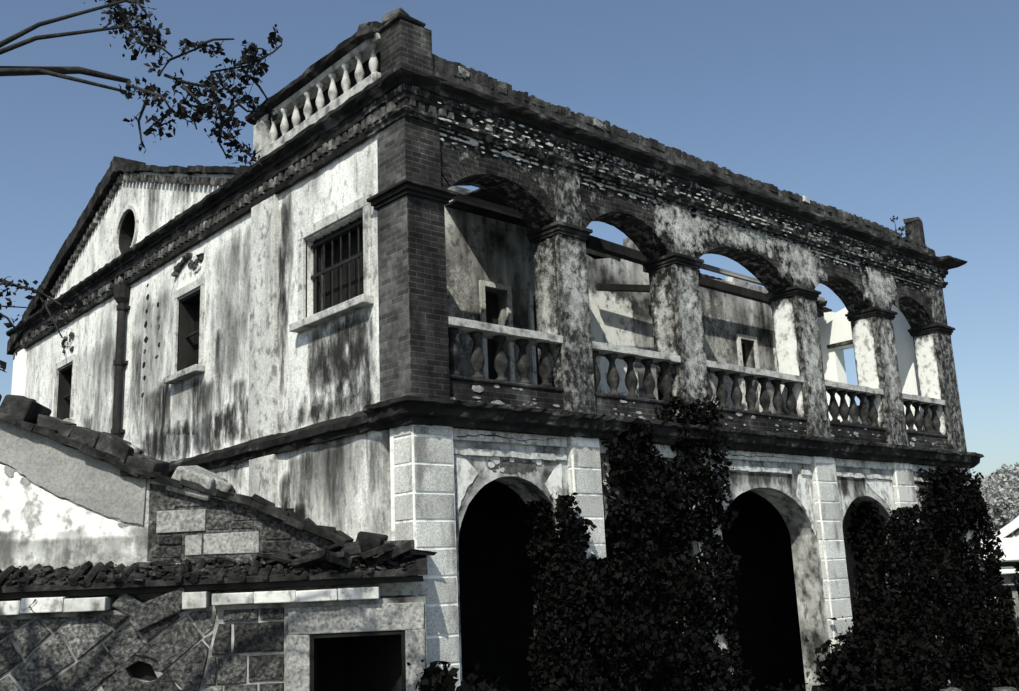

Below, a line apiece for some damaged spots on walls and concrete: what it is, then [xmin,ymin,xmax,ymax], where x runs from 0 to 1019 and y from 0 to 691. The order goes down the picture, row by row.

flaking render [439,104,942,293]
water stain [231,244,239,266]
water stain [279,203,291,278]
water stain [87,343,115,428]
water stain [133,299,248,461]
water stain [298,315,372,425]
flaking render [472,385,505,404]
flaking render [0,462,143,567]
flaking render [220,470,248,496]
flaking render [156,499,437,568]
water stain [281,446,352,519]
flaking render [487,457,542,474]